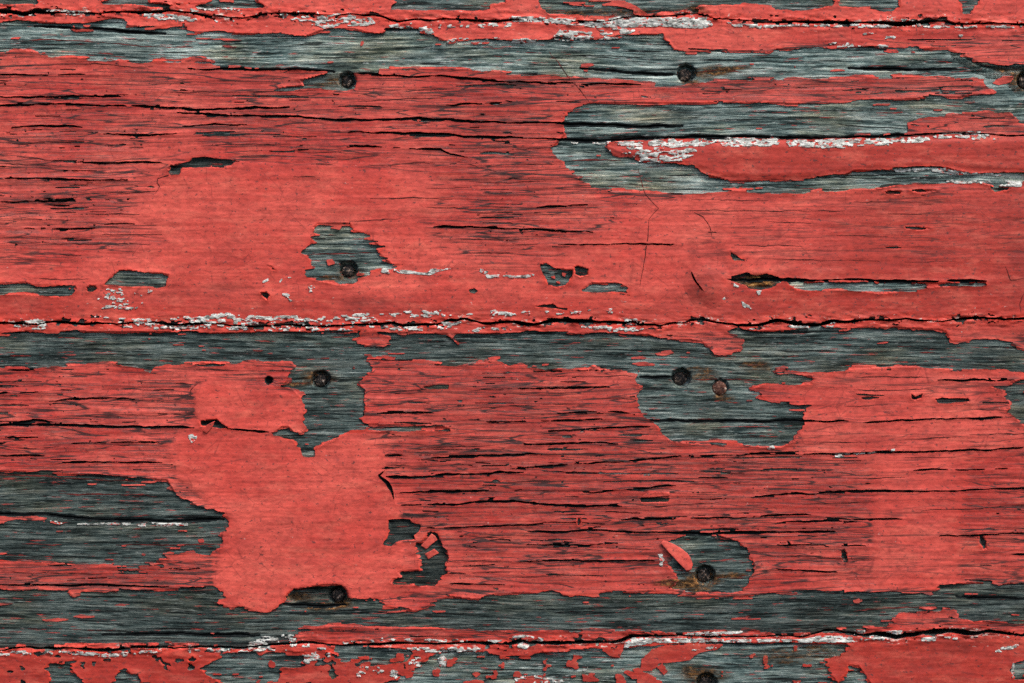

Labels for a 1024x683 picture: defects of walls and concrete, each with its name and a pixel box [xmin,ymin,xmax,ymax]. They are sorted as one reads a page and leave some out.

peeling [0,0,1024,198]
crack [0,25,1024,311]
peeling [301,223,451,292]
peeling [0,304,1024,457]
peeling [0,470,229,572]
peeling [383,517,454,586]
peeling [0,529,1024,683]
crack [369,375,1024,585]
rust [660,572,744,591]